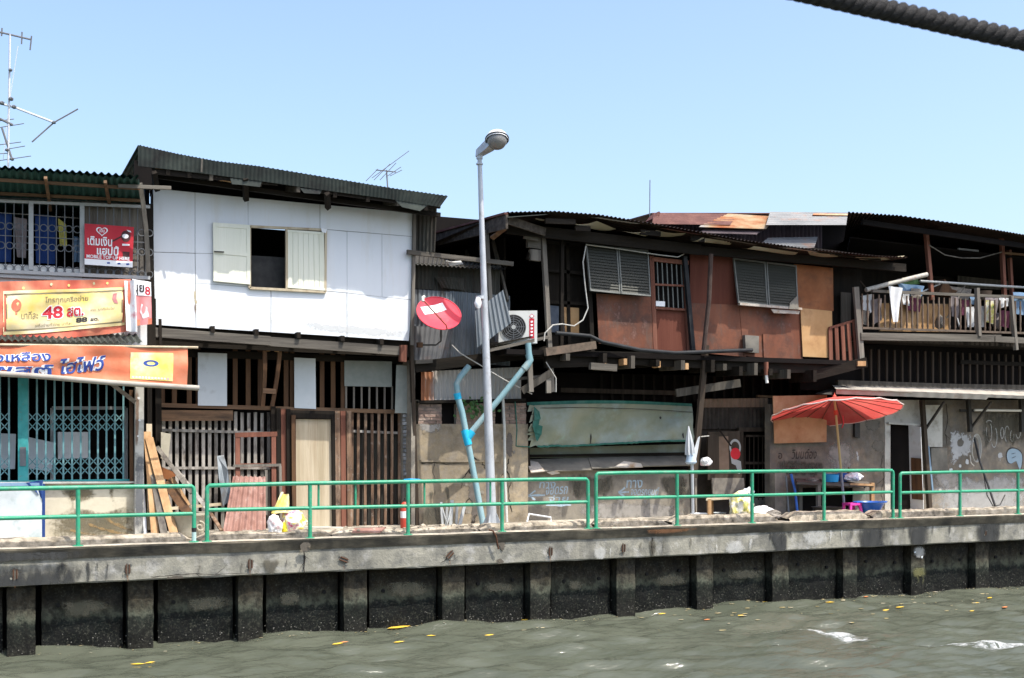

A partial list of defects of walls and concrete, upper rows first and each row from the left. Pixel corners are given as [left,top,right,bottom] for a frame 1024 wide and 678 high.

peeling [935,431,974,490]
damp [656,575,685,586]
damp [729,570,761,580]
damp [388,582,426,596]
damp [483,583,516,593]
damp [63,601,108,616]
damp [186,597,227,610]
damp [271,592,310,605]